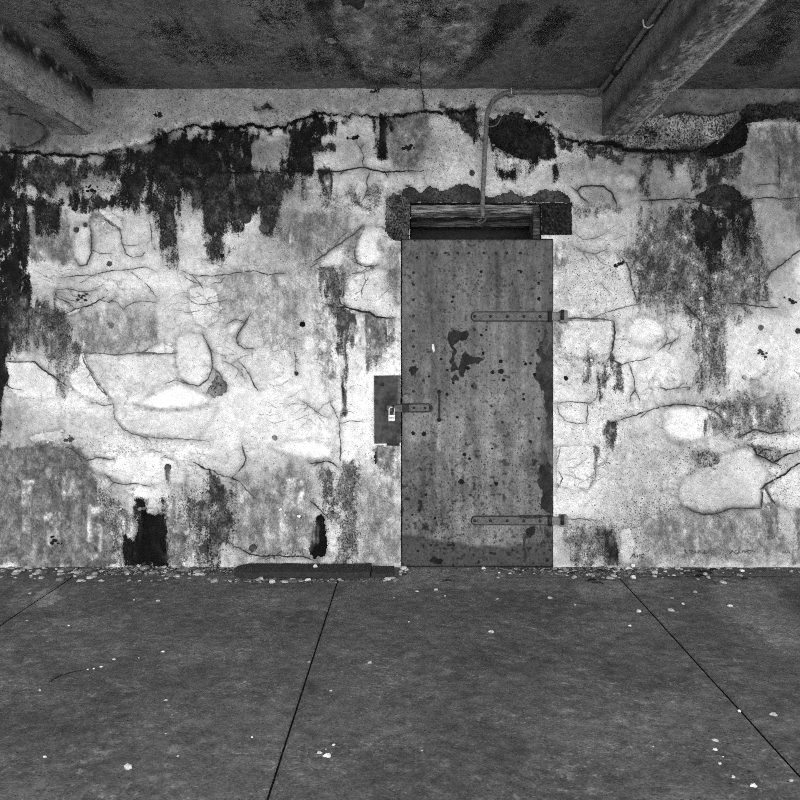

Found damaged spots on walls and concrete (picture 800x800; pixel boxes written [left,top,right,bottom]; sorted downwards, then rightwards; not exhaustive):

crack [0,107,122,159]
crack [545,124,705,154]
spalling [601,101,800,159]
crack [30,215,362,468]
leakage [0,109,401,568]
crack [310,225,393,319]
leakage [439,101,800,441]
crack [563,218,722,420]
crack [193,443,258,501]
crack [687,425,800,519]
spalling [0,498,218,583]
spalling [249,514,328,567]